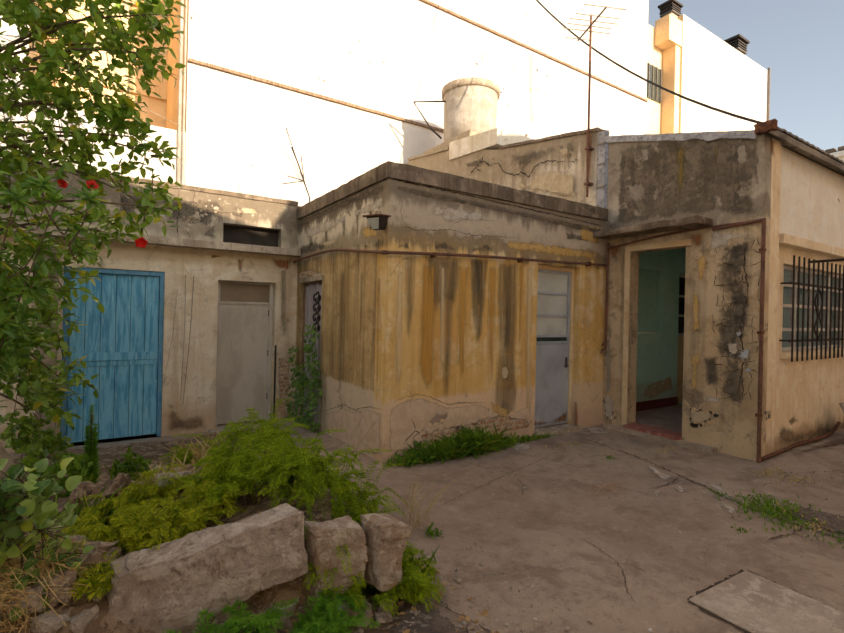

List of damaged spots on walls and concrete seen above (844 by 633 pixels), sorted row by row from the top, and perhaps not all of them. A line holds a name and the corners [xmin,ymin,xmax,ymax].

flaking render [182,198,226,232]
crack [393,179,601,239]
crack [471,155,579,177]
peeling [506,225,599,260]
damp [618,138,758,223]
damp [429,245,532,414]
crack [712,238,761,402]
flaking render [326,399,533,454]
crack [576,435,842,540]
crack [584,539,645,604]